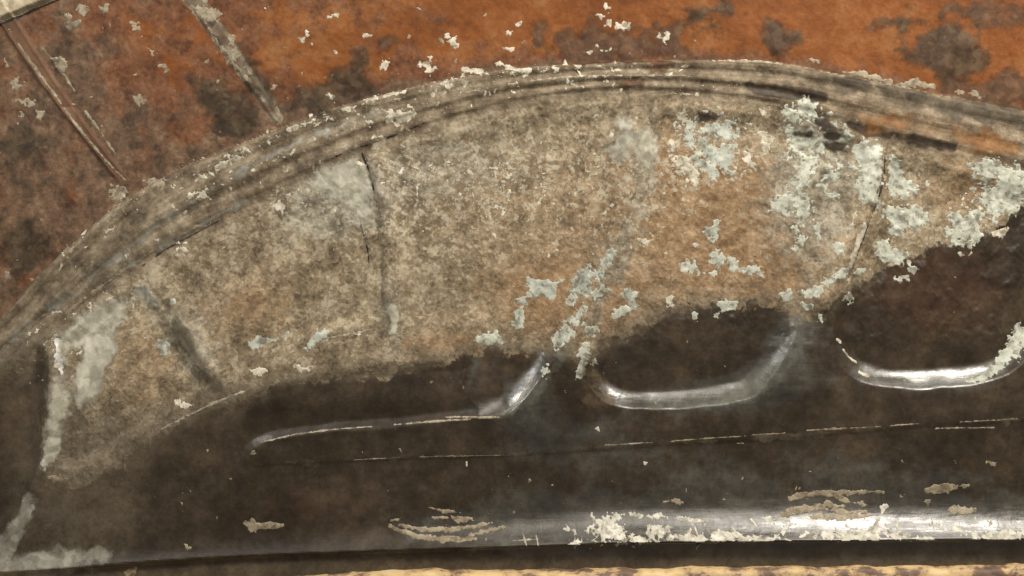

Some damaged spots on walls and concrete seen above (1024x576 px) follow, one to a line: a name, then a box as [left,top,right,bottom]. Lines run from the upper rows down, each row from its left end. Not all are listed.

rust [565,53,684,87]
rust [745,82,827,102]
rust [832,76,888,88]
rust [793,115,1019,155]
crack [847,154,887,283]
leakage [2,200,247,468]
rust [172,321,221,391]
leakage [394,379,532,426]
leakage [263,426,372,442]
leakage [0,493,108,576]
leakage [388,507,506,544]
leakage [780,489,884,523]